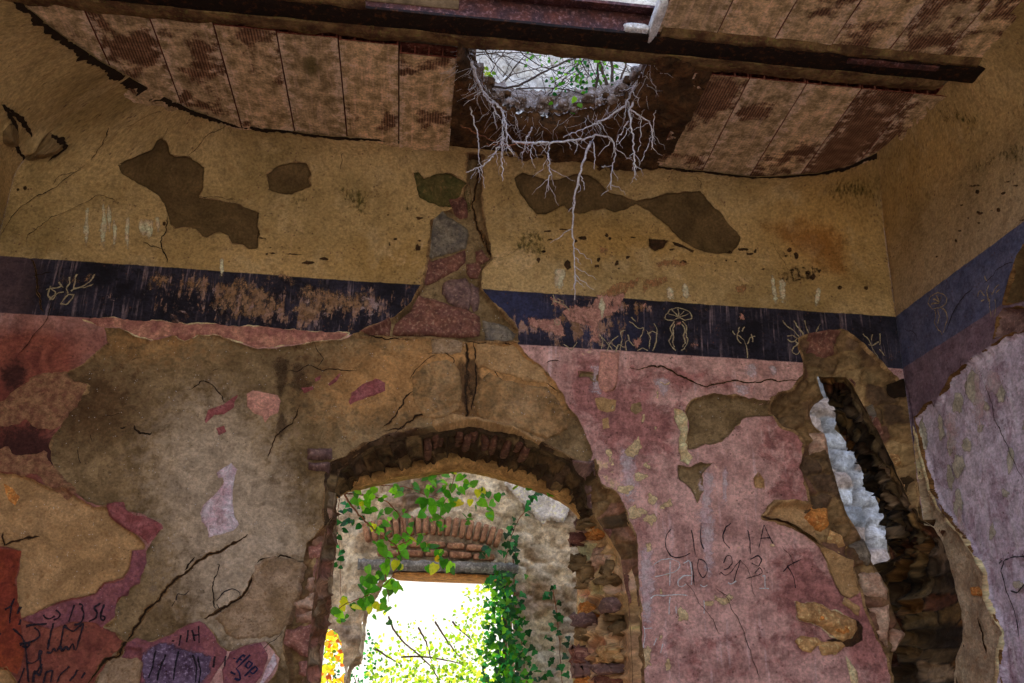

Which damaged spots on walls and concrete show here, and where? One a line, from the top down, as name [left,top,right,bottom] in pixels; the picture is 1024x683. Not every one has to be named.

spalling [455,46,627,116]
crack [268,408,299,456]
crack [289,345,352,372]
flaking render [0,138,740,683]
crack [366,336,515,446]
flaking render [674,393,773,503]
crack [629,329,987,683]
flaking render [913,244,1024,683]
crack [88,534,304,683]
flaking render [795,548,863,683]